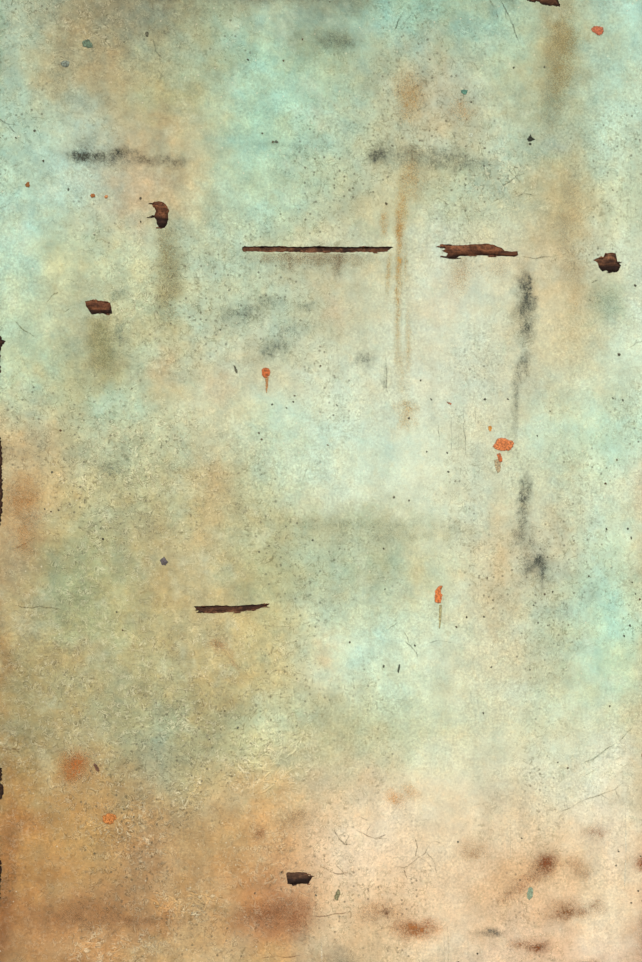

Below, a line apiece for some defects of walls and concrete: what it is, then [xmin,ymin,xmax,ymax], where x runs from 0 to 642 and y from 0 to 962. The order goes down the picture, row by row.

spalling [139,197,169,229]
spalling [436,244,518,259]
spalling [594,253,621,273]
spalling [85,299,112,315]
damp [520,276,536,331]
rust [261,368,270,393]
rust [488,426,514,473]
rust [435,586,443,628]
spalling [281,871,317,896]